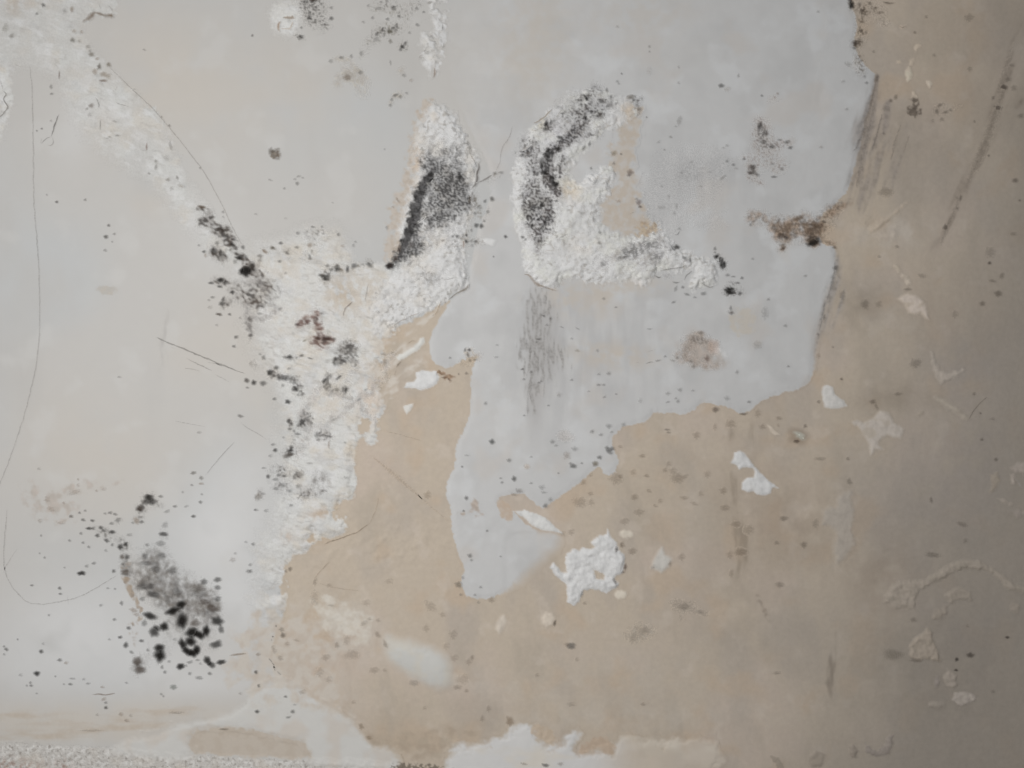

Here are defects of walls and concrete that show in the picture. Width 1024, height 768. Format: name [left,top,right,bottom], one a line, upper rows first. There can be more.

leakage [69,28,112,82]
spalling [0,0,243,280]
leakage [193,0,504,513]
leakage [549,422,627,508]
flaking render [233,0,1024,768]
leakage [503,72,797,304]
leakage [743,199,846,336]
leakage [0,467,315,762]